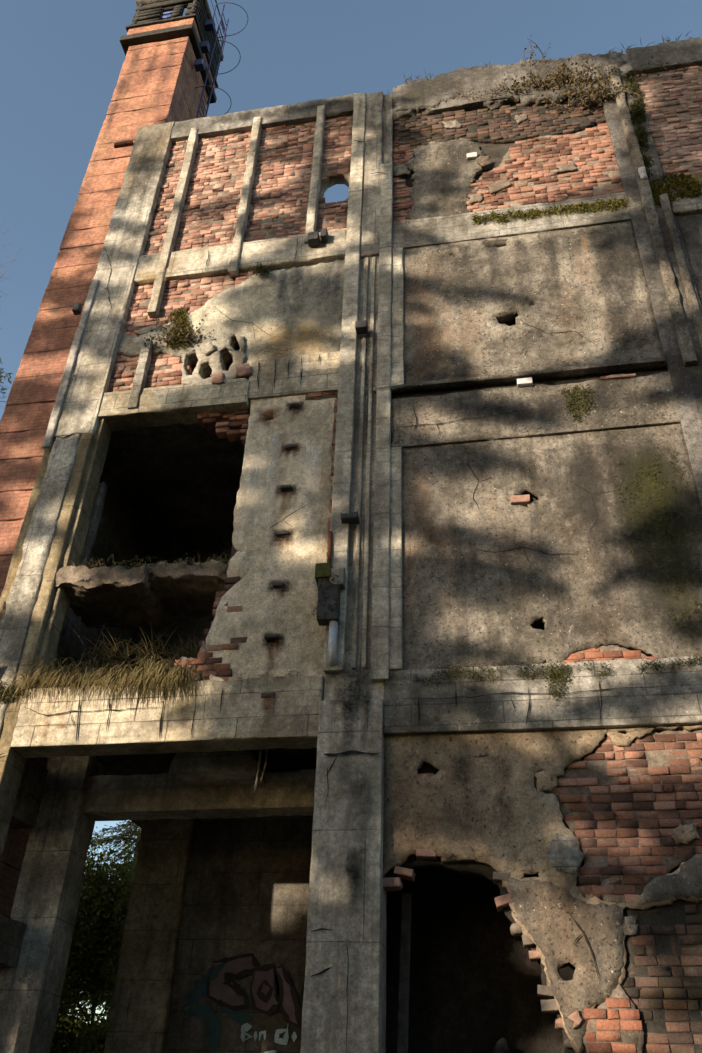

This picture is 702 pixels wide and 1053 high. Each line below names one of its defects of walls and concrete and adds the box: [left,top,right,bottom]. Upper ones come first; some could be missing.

spalling [392,93,624,223]
spalling [122,270,256,337]
spalling [108,333,252,392]
crack [467,463,490,508]
crack [475,480,643,561]
water stain [574,442,687,628]
spalling [174,641,232,682]
spalling [418,764,439,777]
spalling [383,849,458,891]
spalling [493,872,514,912]
spalling [534,728,702,1053]
spalling [510,923,541,962]